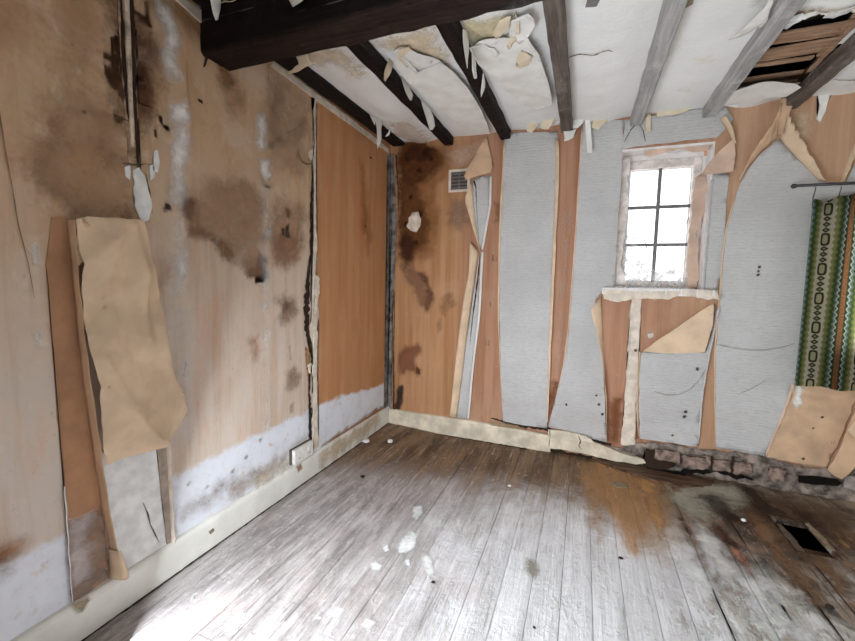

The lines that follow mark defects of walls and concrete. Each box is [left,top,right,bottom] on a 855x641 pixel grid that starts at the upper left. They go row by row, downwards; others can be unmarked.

leakage [171,104,189,194]
leakage [188,181,304,276]
crack [268,72,320,451]
leakage [397,123,470,308]
leakage [395,385,403,409]
leakage [399,345,420,374]
leakage [74,599,89,611]